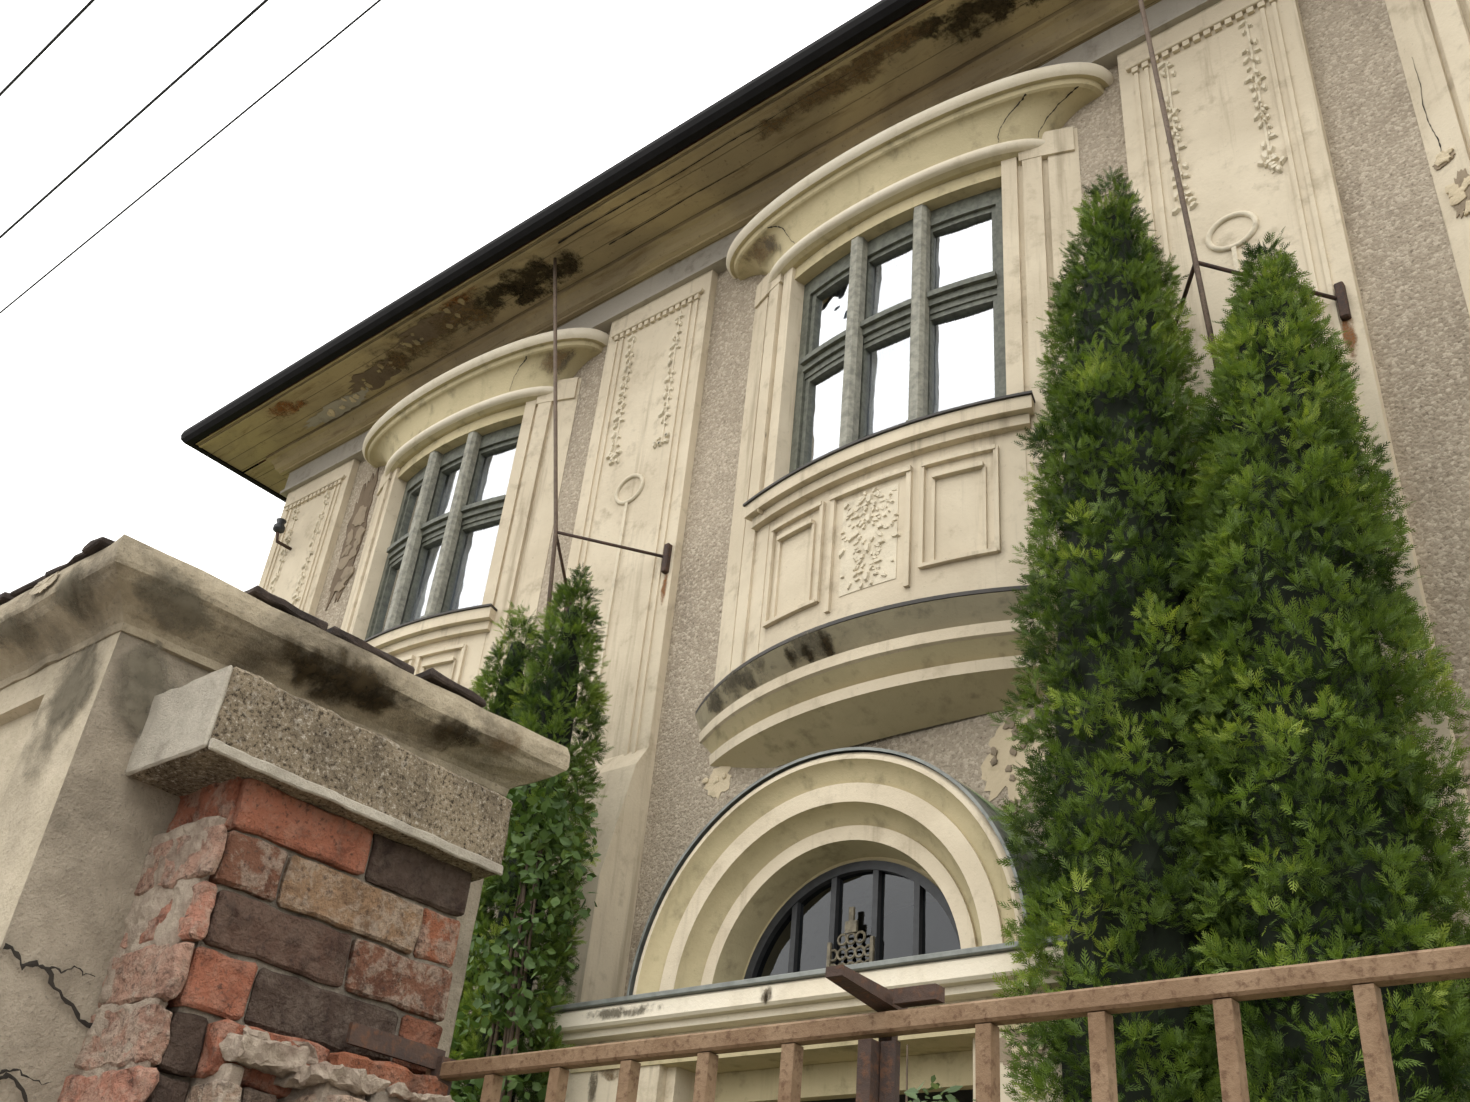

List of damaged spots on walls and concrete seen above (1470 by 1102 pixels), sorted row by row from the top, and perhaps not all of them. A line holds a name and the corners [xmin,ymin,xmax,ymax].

damp [760,0,1043,140]
spalling [1432,148,1470,219]
damp [372,252,582,369]
damp [54,563,90,617]
damp [0,615,37,645]
damp [39,642,96,748]
damp [114,572,211,735]
damp [282,638,408,715]
damp [435,718,517,750]
crack [3,943,95,1028]
crack [0,1068,50,1102]